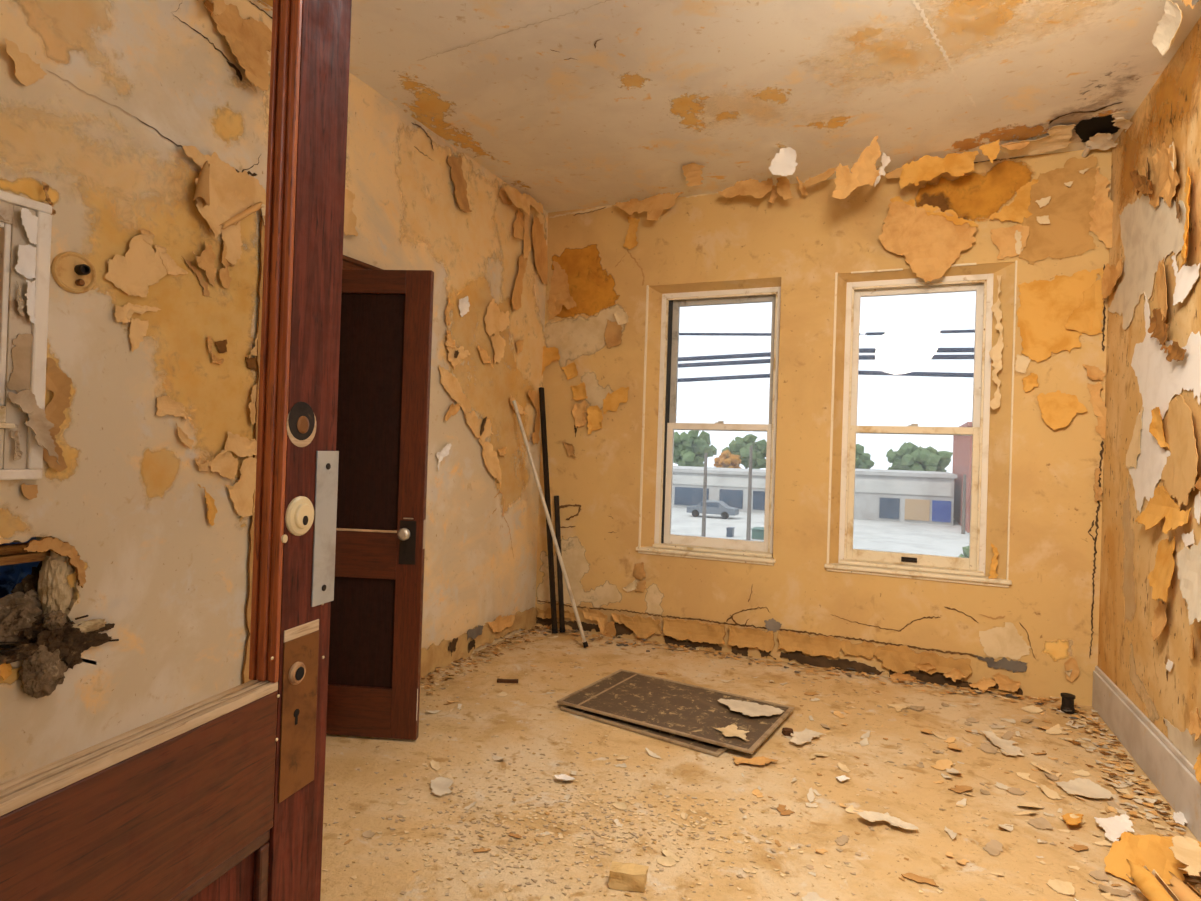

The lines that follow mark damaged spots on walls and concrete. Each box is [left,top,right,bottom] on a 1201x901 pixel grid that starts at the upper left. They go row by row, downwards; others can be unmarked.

crack [47,70,183,147]
peeling [105,145,266,352]
crack [174,4,242,81]
crack [236,155,261,176]
leakage [670,93,738,132]
leakage [915,159,1033,221]
leakage [952,125,1048,153]
leakage [1120,36,1201,206]
peeling [156,334,258,526]
peeling [718,102,1201,659]
spalling [0,536,119,699]
spalling [416,537,1031,721]